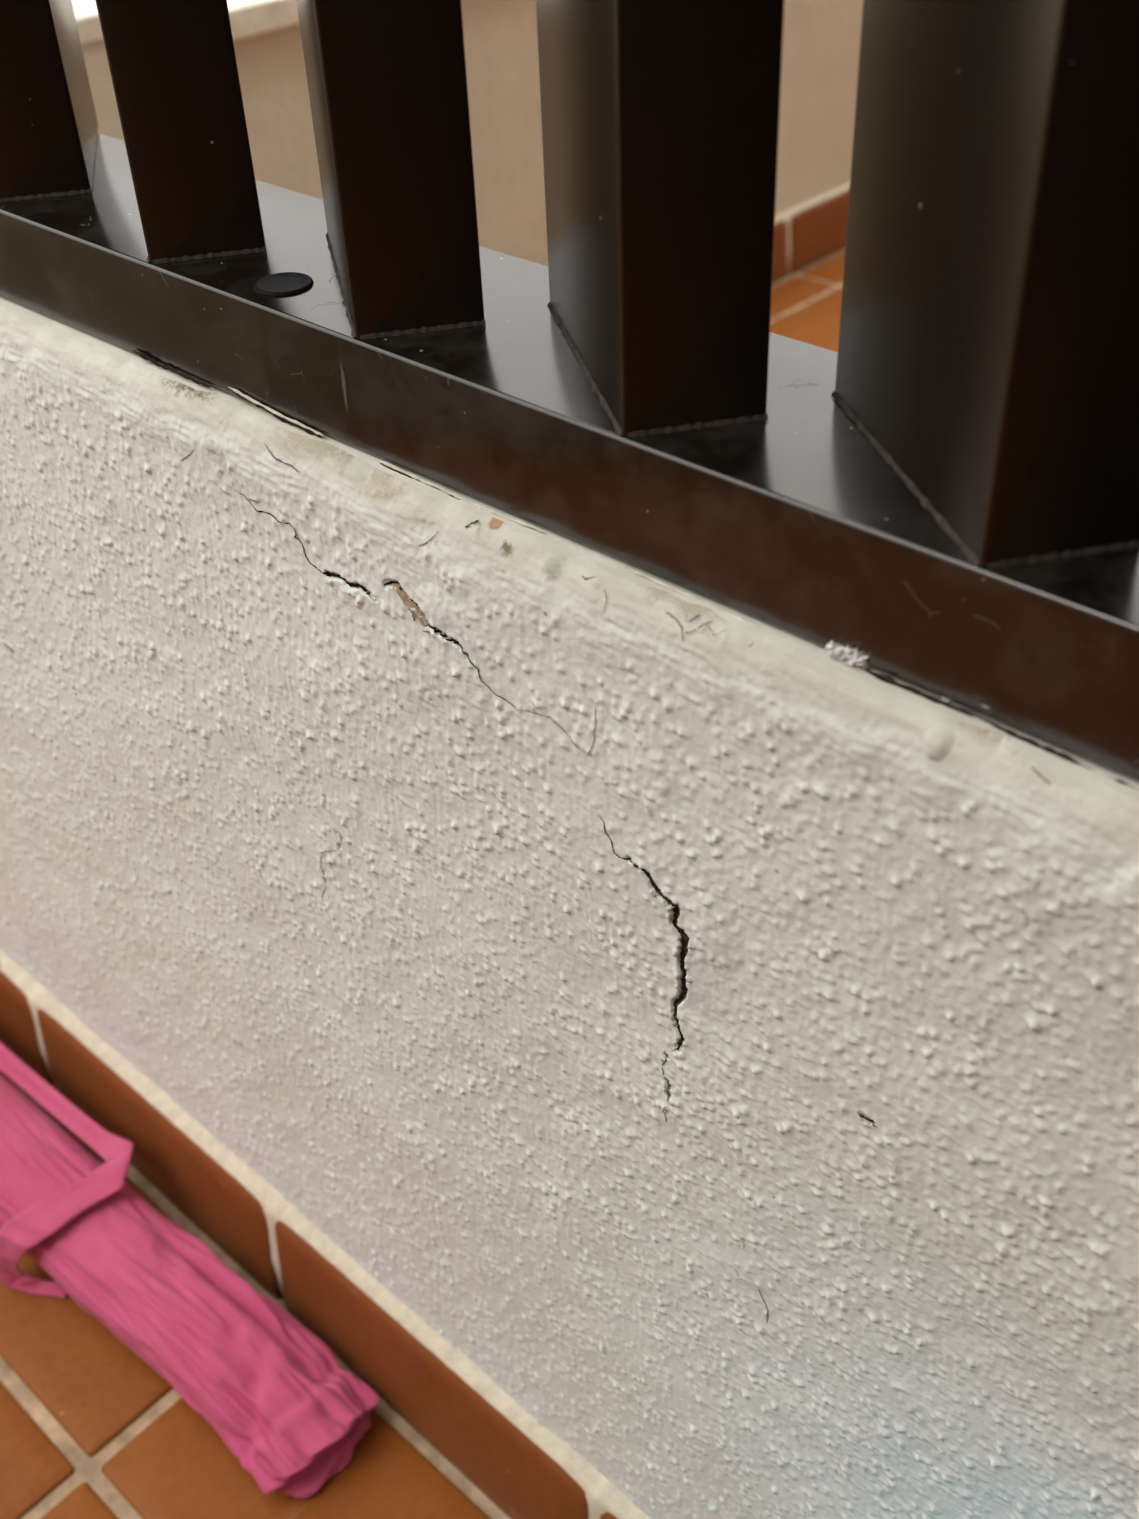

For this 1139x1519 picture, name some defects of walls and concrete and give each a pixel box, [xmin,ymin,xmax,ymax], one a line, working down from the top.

crack [220,488,596,756]
crack [596,813,695,1121]